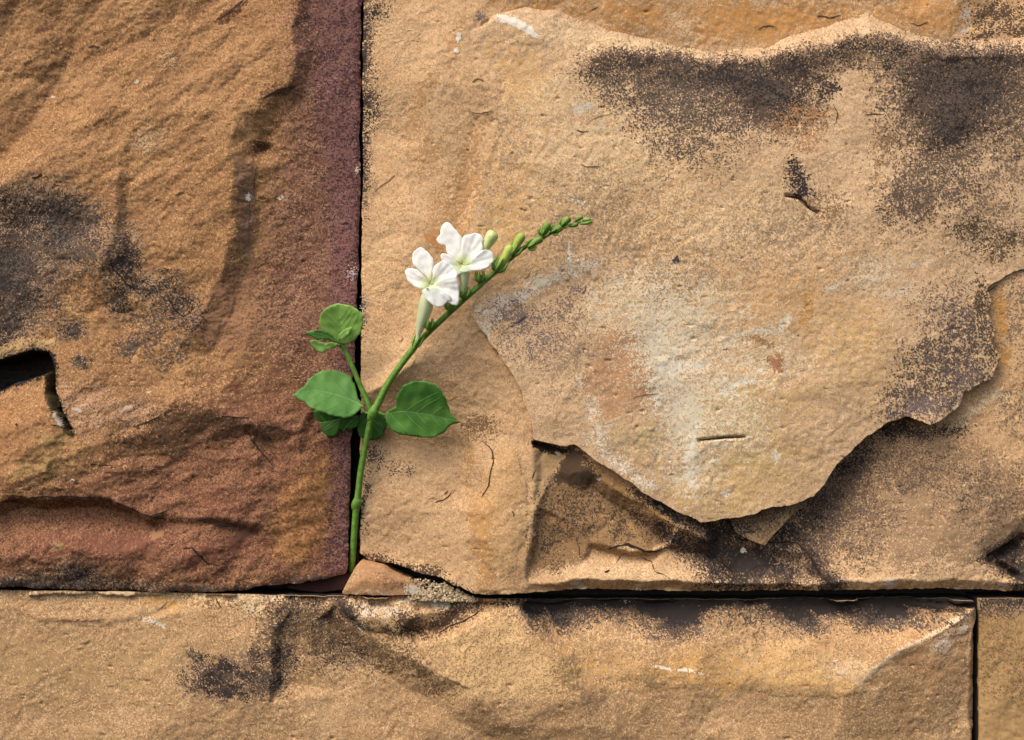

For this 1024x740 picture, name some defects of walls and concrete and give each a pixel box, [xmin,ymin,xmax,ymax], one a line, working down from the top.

spalling [0,337,61,355]
water stain [0,159,305,462]
crack [481,441,494,498]
water stain [0,270,1024,716]
crack [605,543,670,579]
peeling [454,7,1024,590]